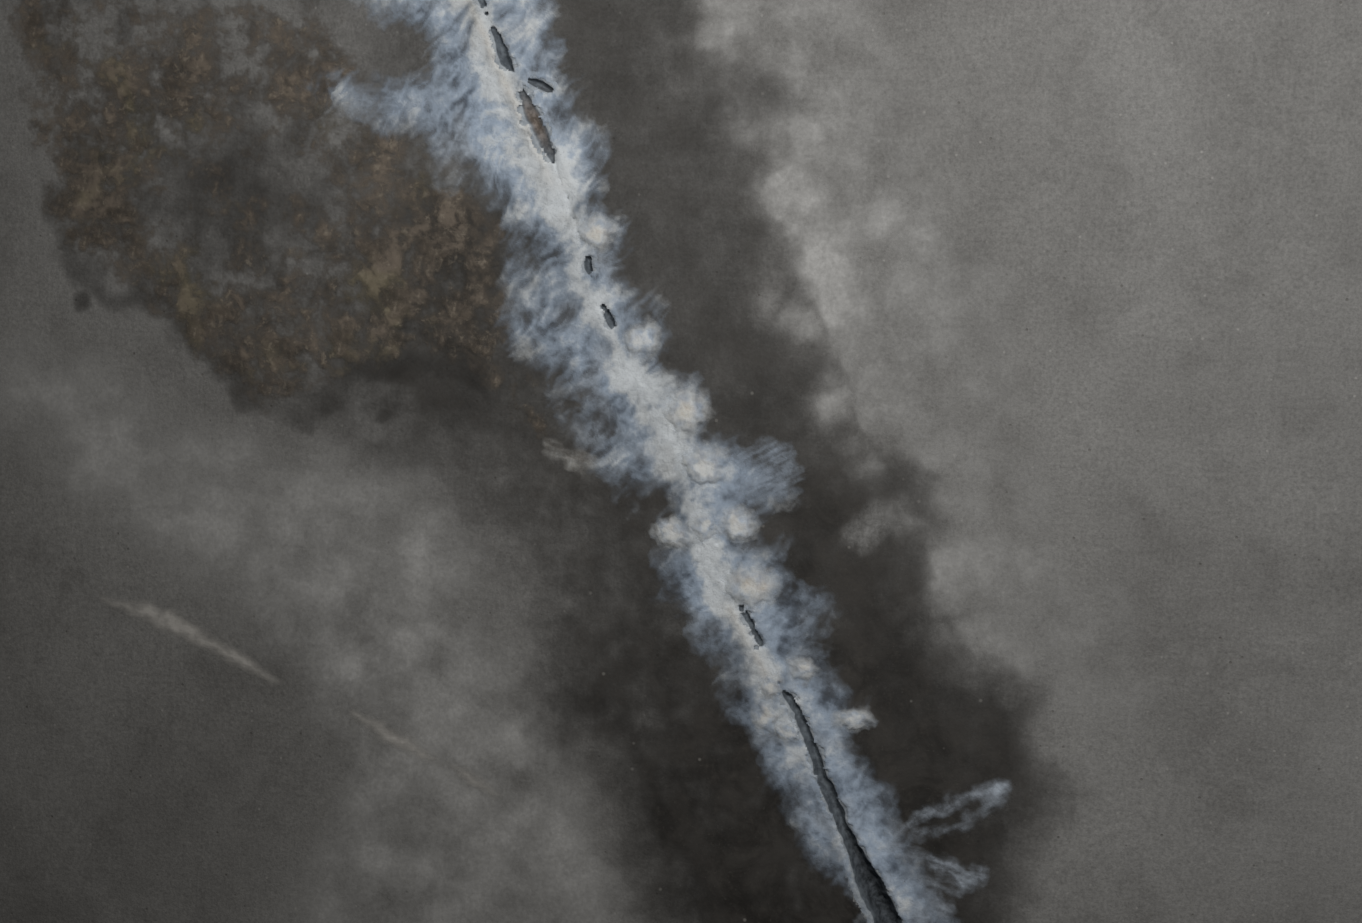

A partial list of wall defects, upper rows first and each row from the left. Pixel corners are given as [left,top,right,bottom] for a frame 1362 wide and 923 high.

leakage [331,81,367,108]
crack [472,0,558,164]
crack [568,196,580,219]
crack [581,254,642,365]
leakage [372,0,1034,923]
efflorescence [10,369,603,923]
crack [738,604,765,650]
crack [778,680,904,923]